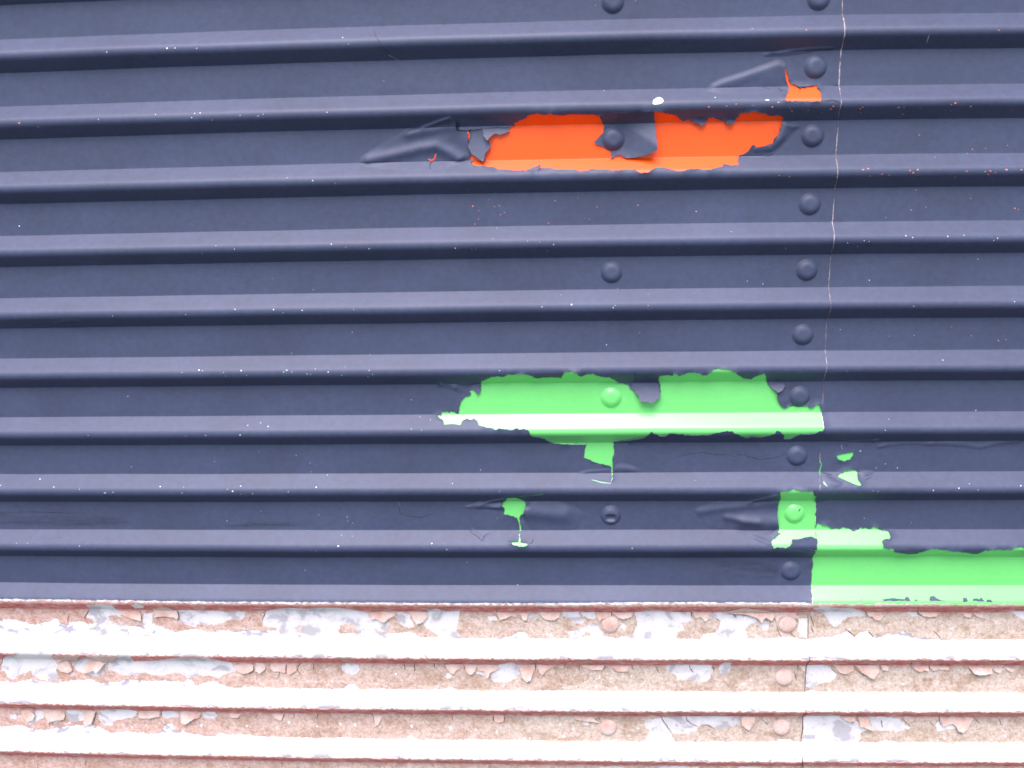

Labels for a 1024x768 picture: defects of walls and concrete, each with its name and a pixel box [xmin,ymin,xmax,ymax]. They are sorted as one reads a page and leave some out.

peeling [459,67,838,173]
crack [822,0,846,402]
peeling [437,369,824,484]
peeling [837,452,861,486]
peeling [488,489,1024,642]
peeling [0,601,462,683]
peeling [434,663,633,690]
peeling [656,662,732,682]
peeling [794,664,904,691]
peeling [10,707,249,728]
peeling [637,716,768,737]
peeling [800,716,910,746]